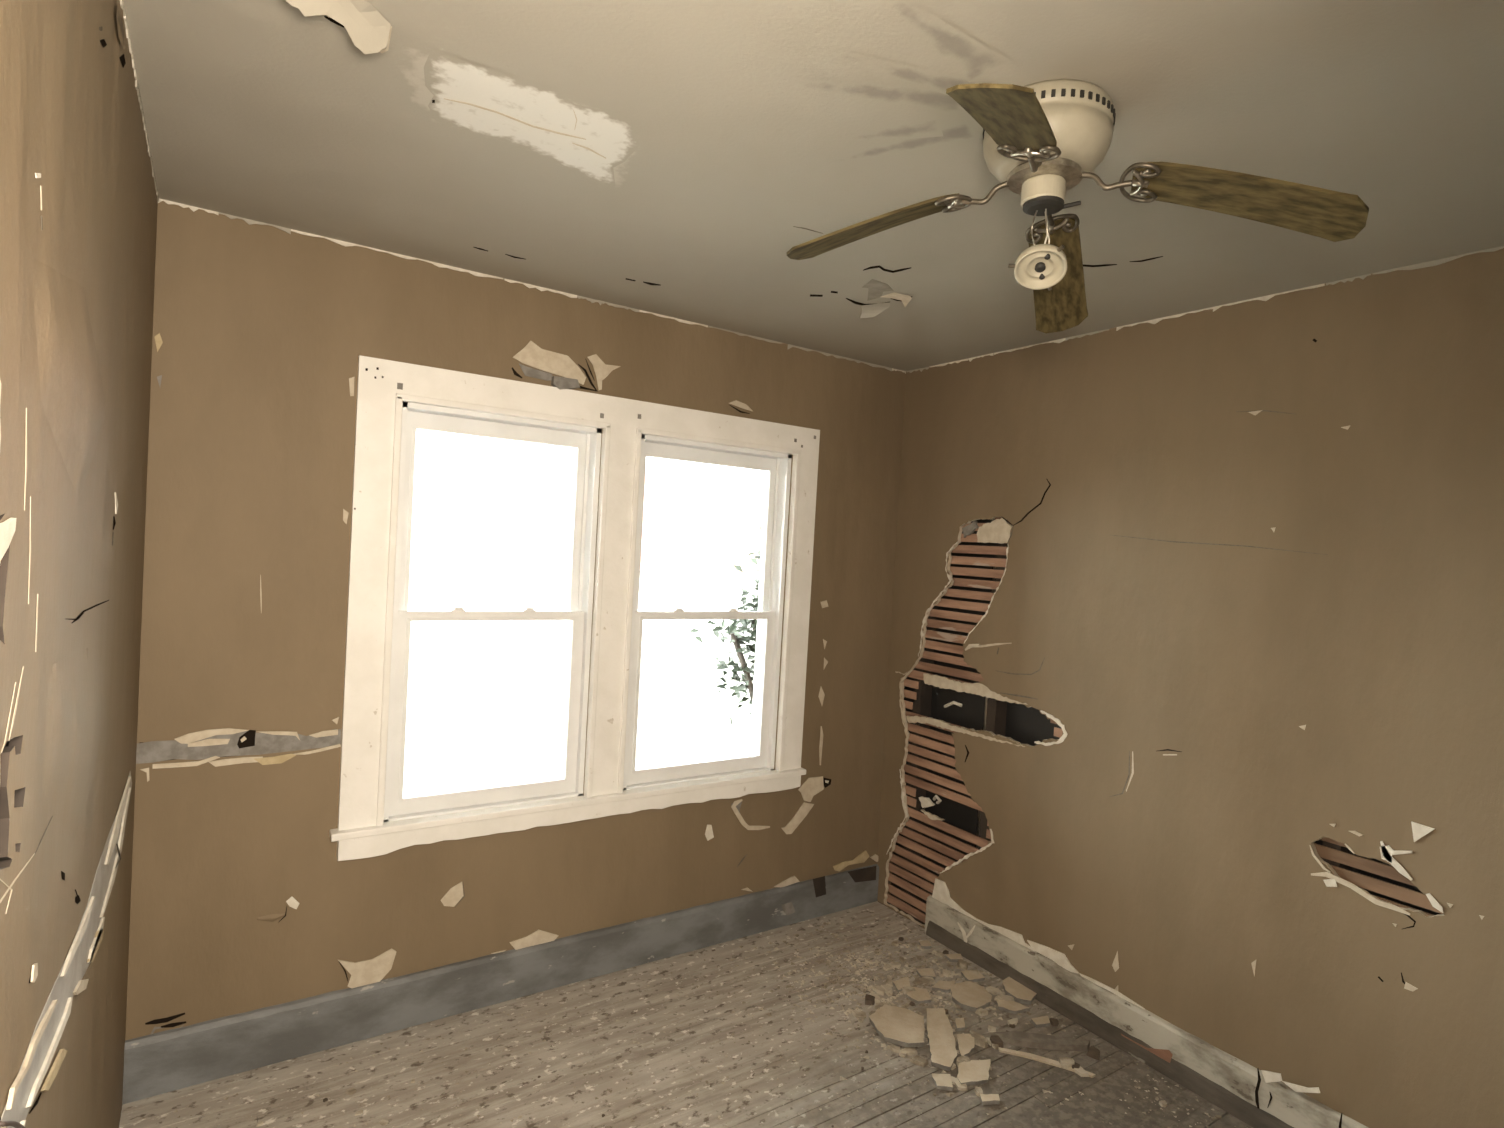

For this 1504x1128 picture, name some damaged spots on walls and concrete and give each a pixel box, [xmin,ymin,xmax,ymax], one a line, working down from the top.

peeling [99,0,1504,374]
peeling [512,341,620,391]
peeling [0,518,16,561]
peeling [731,726,831,834]
spalling [774,517,1145,1010]
peeling [0,717,342,1128]
peeling [338,948,396,988]
spalling [1310,822,1453,929]